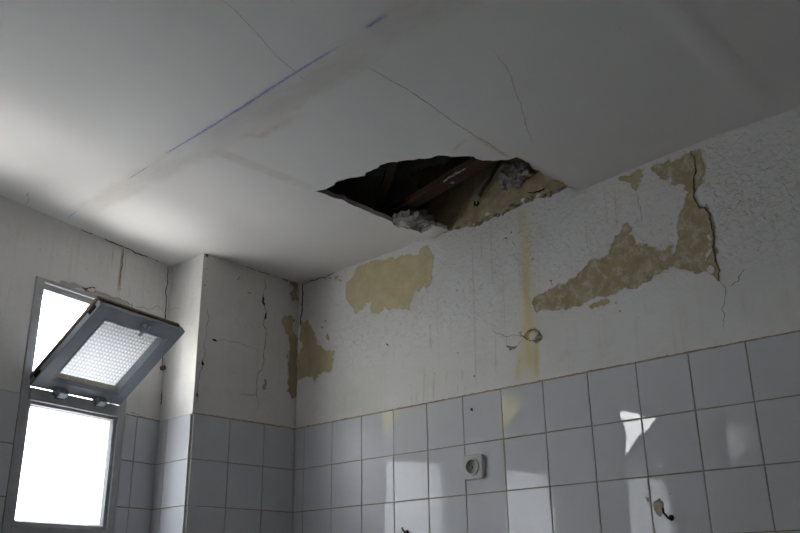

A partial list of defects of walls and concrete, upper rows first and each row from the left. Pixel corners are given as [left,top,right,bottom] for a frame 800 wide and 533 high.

crack [368,67,570,187]
crack [196,262,335,408]
peeling [281,314,335,400]
peeling [327,244,435,315]
flaking render [410,156,568,233]
peeling [531,148,722,314]
crack [690,151,744,327]